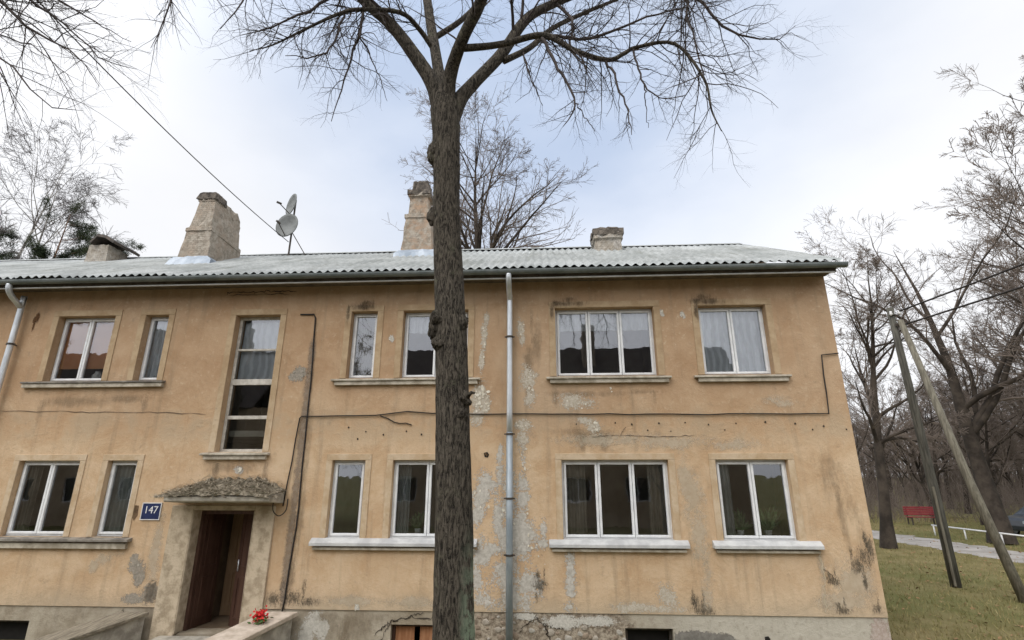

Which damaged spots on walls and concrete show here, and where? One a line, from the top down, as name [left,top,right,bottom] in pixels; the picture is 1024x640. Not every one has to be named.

peeling [469,311,494,428]
peeling [552,393,604,438]
peeling [472,362,549,612]
flaking render [121,553,158,606]
crack [375,613,430,640]
leakage [691,592,714,615]
leakage [850,532,874,589]